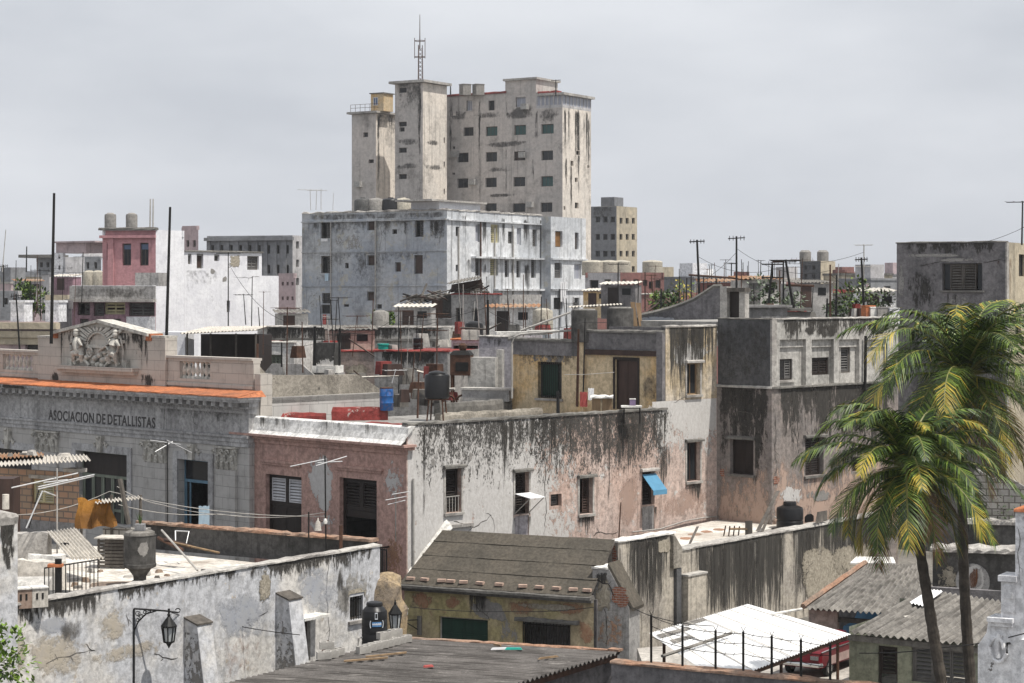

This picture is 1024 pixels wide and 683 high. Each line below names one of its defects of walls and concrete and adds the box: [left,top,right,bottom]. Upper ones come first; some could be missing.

water stain [506,107,590,203]
water stain [908,274,934,308]
peeling [307,453,335,529]
water stain [411,410,672,498]
water stain [18,592,101,638]
water stain [118,570,236,600]
peeling [217,570,295,670]
water stain [251,548,372,609]
water stain [626,535,667,606]
water stain [694,517,878,615]